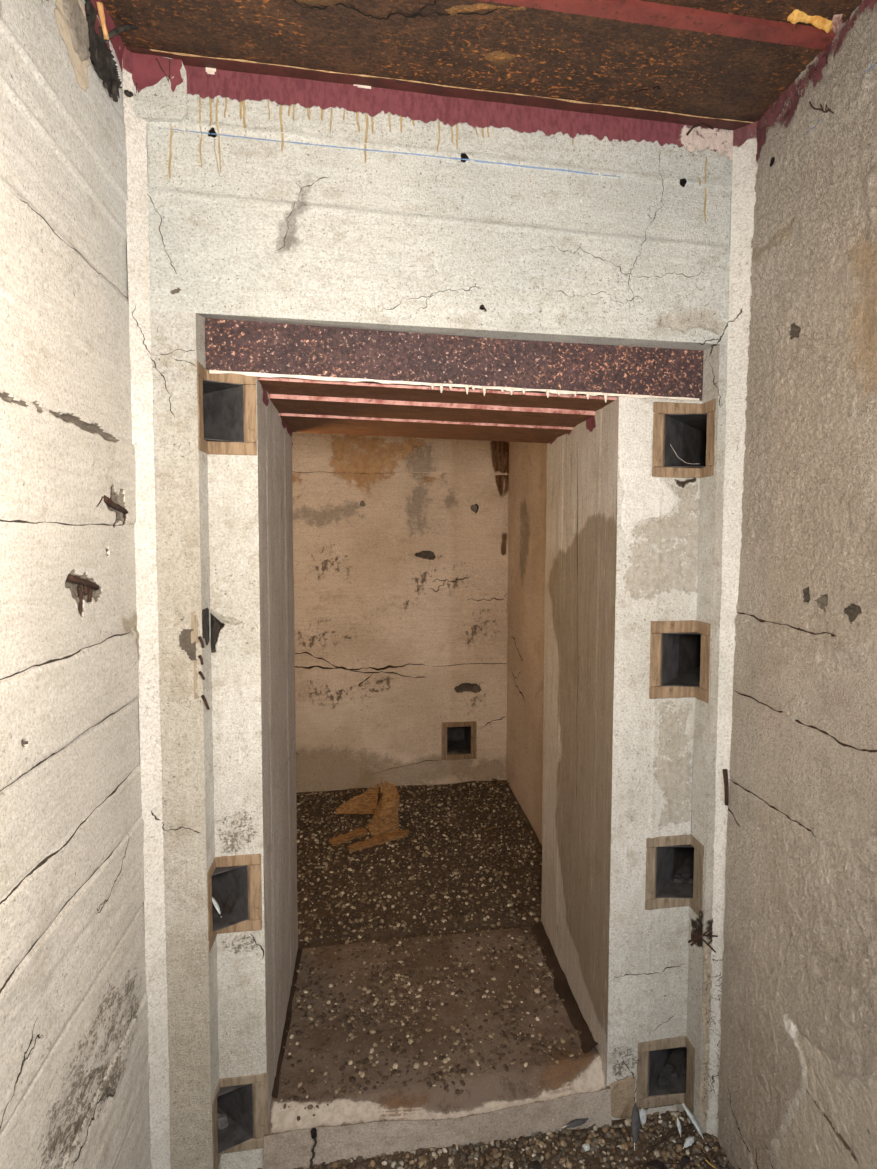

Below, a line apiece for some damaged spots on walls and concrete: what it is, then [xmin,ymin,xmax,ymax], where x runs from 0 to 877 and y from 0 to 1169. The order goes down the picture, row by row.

spalling [54,0,139,107]
rust [199,97,246,171]
rust [268,101,374,162]
rust [445,3,527,16]
rust [485,51,517,66]
peeling [184,0,877,162]
crack [0,518,128,526]
spalling [61,476,130,629]
crack [295,576,525,727]
crack [732,689,877,753]
crack [0,766,137,904]
crack [0,834,130,993]